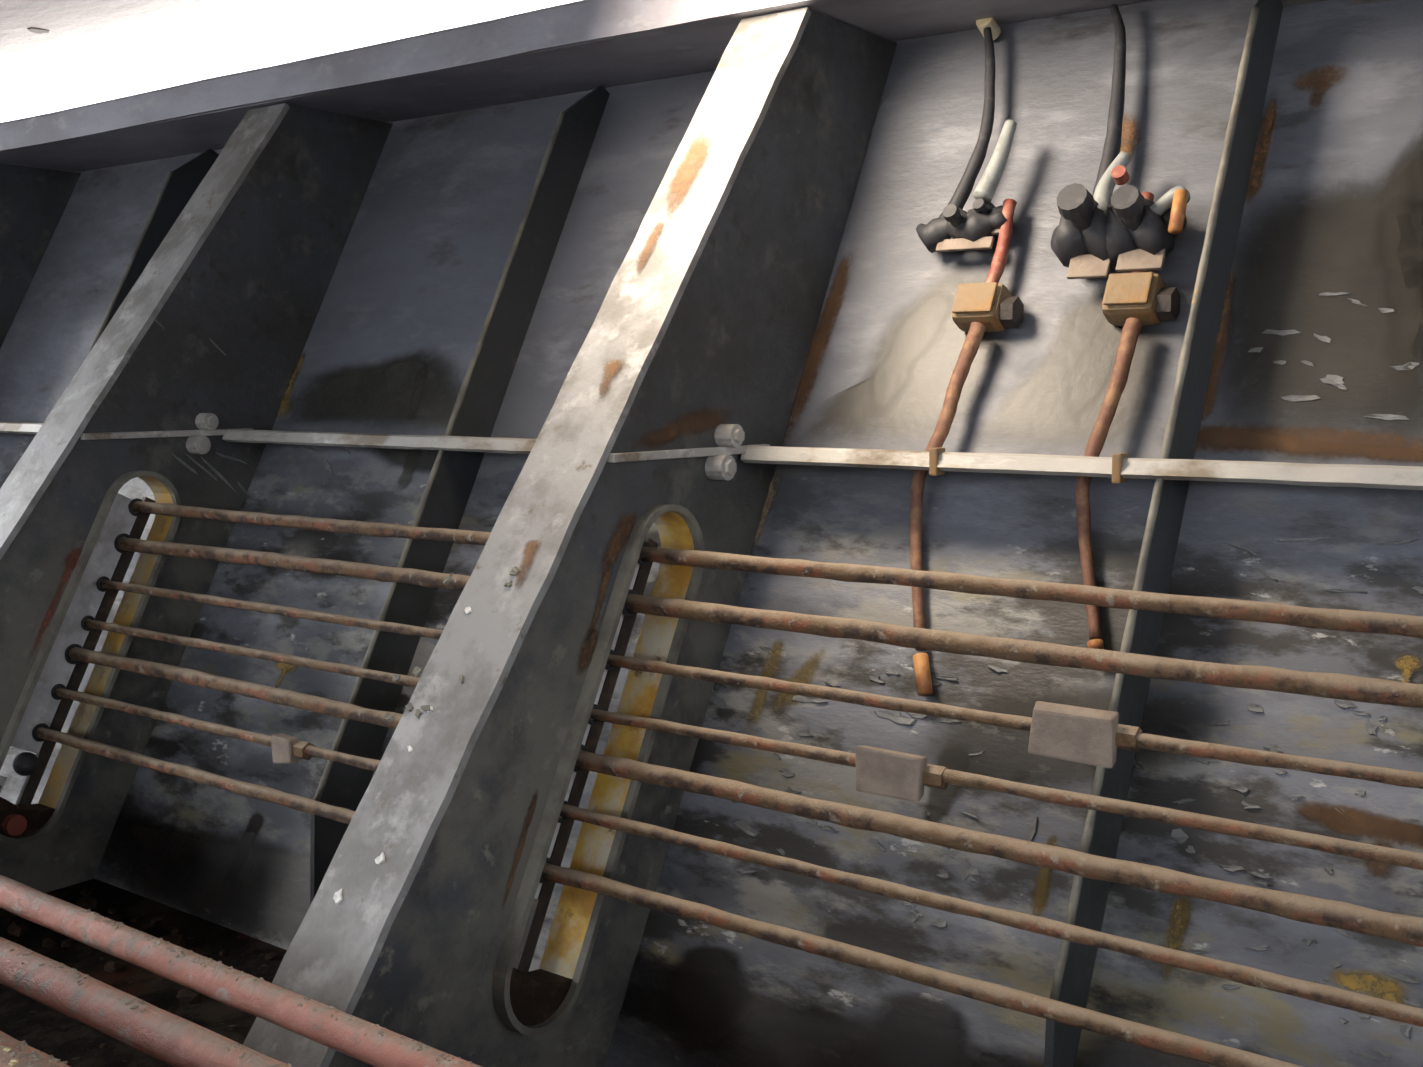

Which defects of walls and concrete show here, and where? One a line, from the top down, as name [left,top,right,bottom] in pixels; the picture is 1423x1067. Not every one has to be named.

rust [1247,103,1276,197]
rust [637,133,708,269]
peeling [1319,292,1395,313]
rust [599,360,622,394]
rust [787,259,847,427]
peeling [1248,329,1347,402]
rust [1195,273,1423,461]
rust [517,540,539,583]
rust [578,514,636,672]
rust [1297,803,1423,875]
water stain [868,994,967,1067]
water stain [1079,1037,1216,1067]